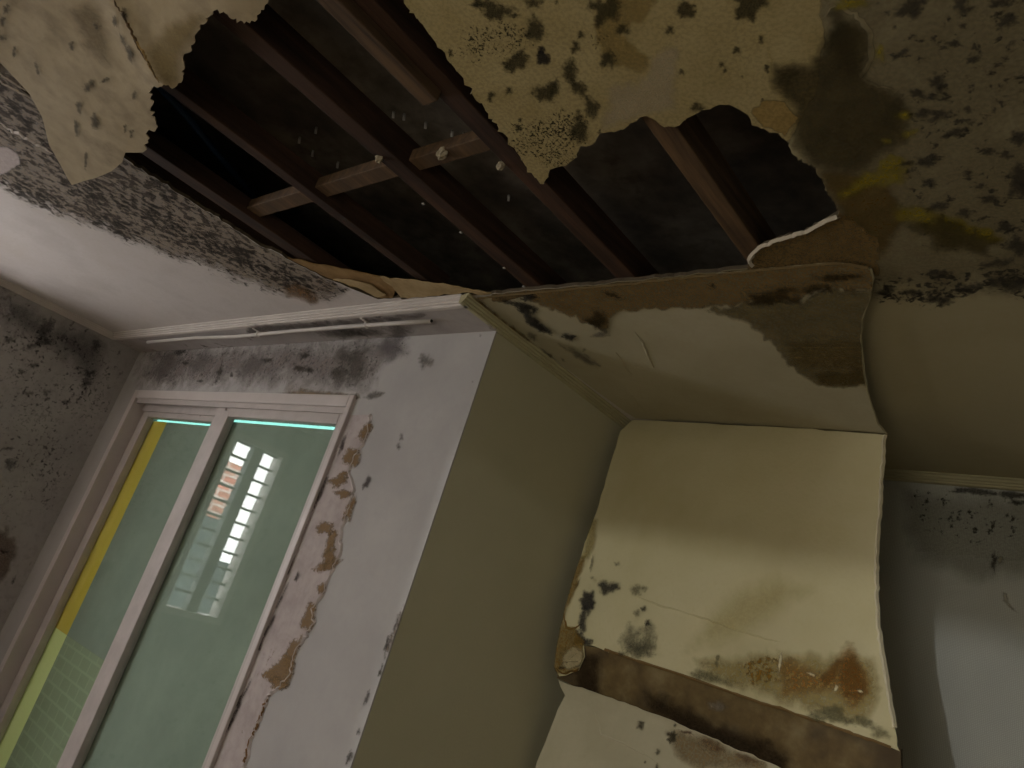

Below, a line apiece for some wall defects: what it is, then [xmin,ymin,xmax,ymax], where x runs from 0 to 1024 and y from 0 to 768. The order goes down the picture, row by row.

water stain [0,70,348,303]
water stain [404,0,1024,388]
water stain [147,314,424,398]
flaking render [213,414,373,768]
water stain [554,521,784,768]
water stain [694,656,885,737]
rust [744,649,868,706]
water stain [914,488,1024,543]